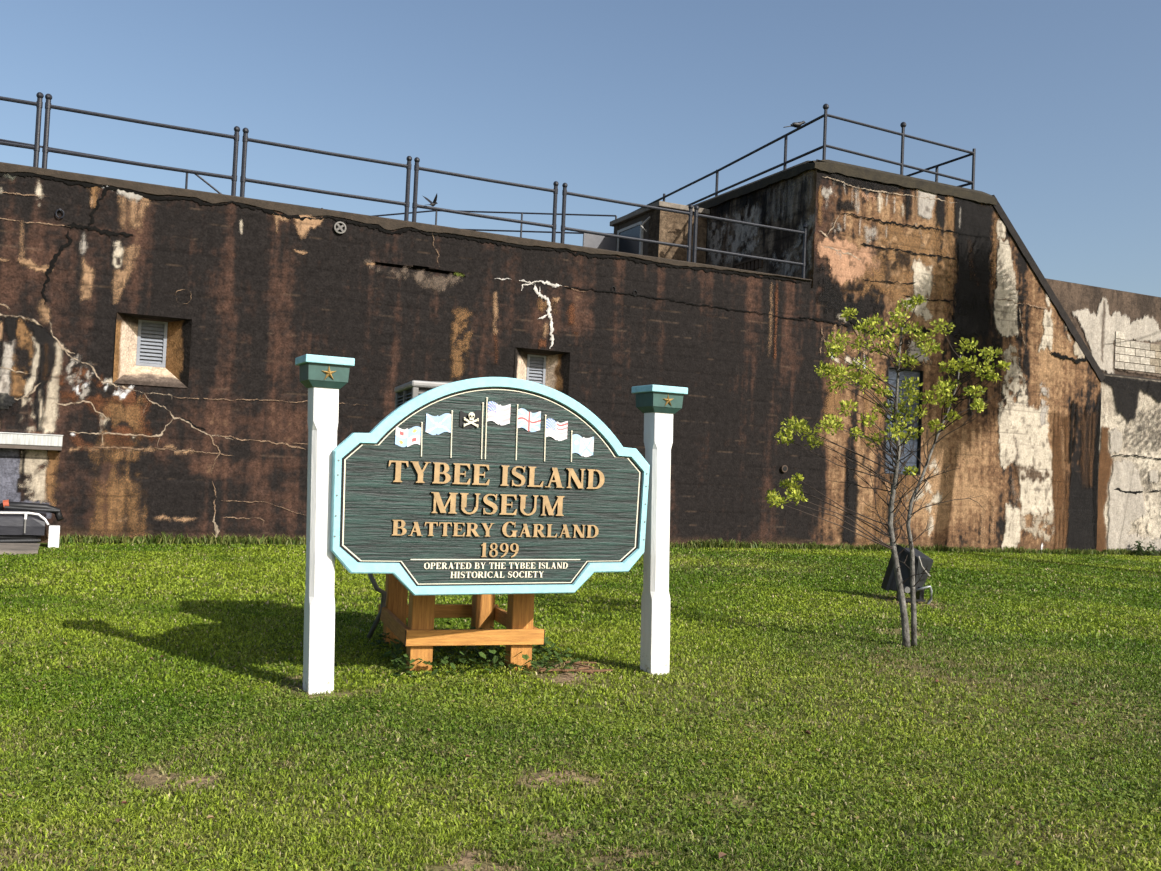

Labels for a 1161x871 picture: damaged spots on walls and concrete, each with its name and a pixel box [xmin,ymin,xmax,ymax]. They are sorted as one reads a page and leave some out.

peeling [912,189,935,219]
leakage [80,235,93,299]
leakage [113,242,138,302]
crack [495,212,989,348]
peeling [817,236,881,285]
leakage [782,173,1001,379]
peeling [887,258,934,321]
leakage [0,299,90,506]
crack [0,172,802,537]
leakage [452,309,470,376]
peeling [994,220,1161,553]
leakage [841,448,865,545]